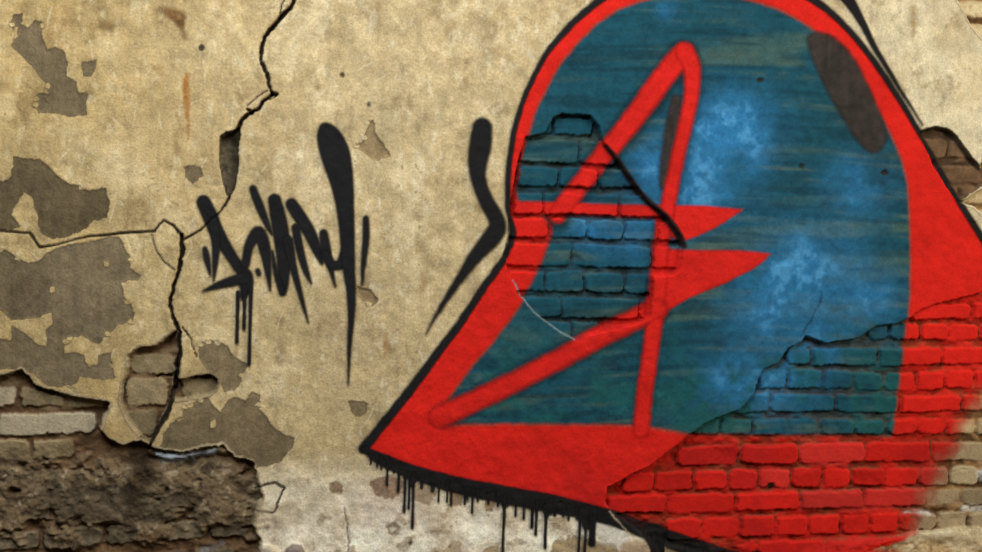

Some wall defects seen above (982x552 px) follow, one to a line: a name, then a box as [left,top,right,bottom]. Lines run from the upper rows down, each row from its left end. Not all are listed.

peeling [8,13,97,117]
crack [238,0,296,126]
spalling [956,0,982,40]
spalling [563,214,625,223]
spalling [920,126,982,224]
crack [0,195,231,448]
spalling [0,156,294,552]
spalling [567,268,641,298]
spalling [683,319,952,497]
spalling [747,509,785,520]
spalling [809,507,836,516]
spalling [881,388,982,536]